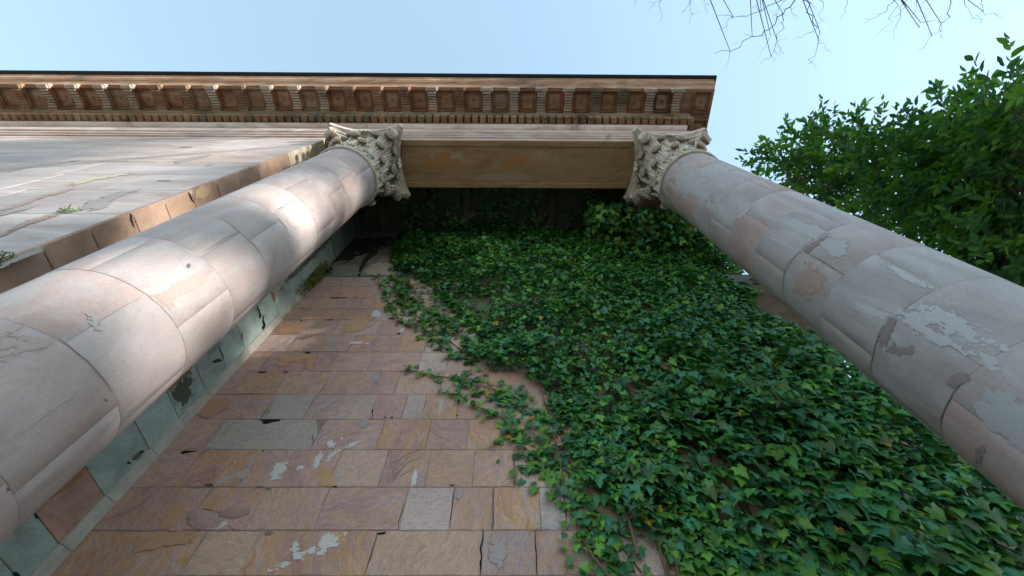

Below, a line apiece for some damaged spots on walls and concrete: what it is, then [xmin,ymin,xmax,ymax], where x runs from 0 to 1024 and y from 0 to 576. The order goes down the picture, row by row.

crack [219,305,266,359]
peeling [269,437,359,487]
peeling [267,532,347,572]